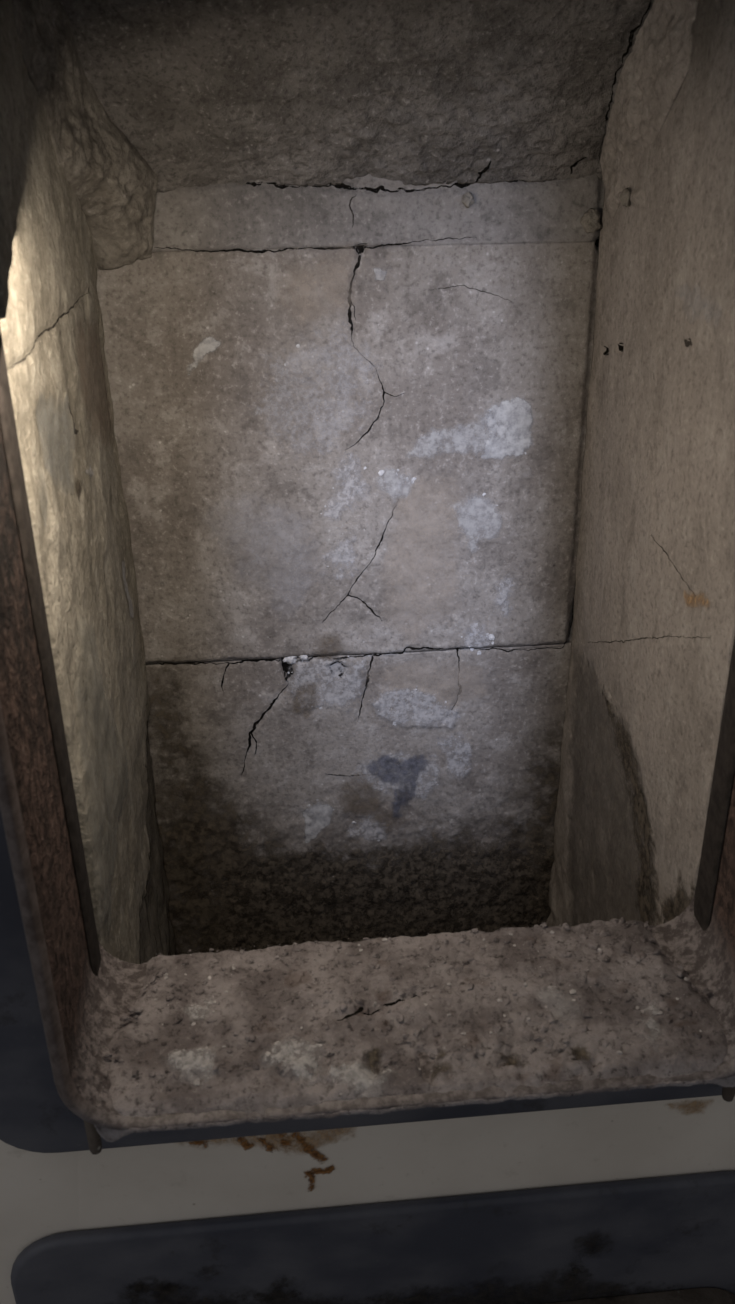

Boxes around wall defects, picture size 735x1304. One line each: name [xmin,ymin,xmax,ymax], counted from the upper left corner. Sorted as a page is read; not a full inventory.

crack [155,0,651,449]
crack [7,289,89,369]
crack [322,502,398,623]
crack [651,535,696,597]
crack [154,623,711,778]
damp [368,756,426,817]
corrosion [189,1128,350,1191]